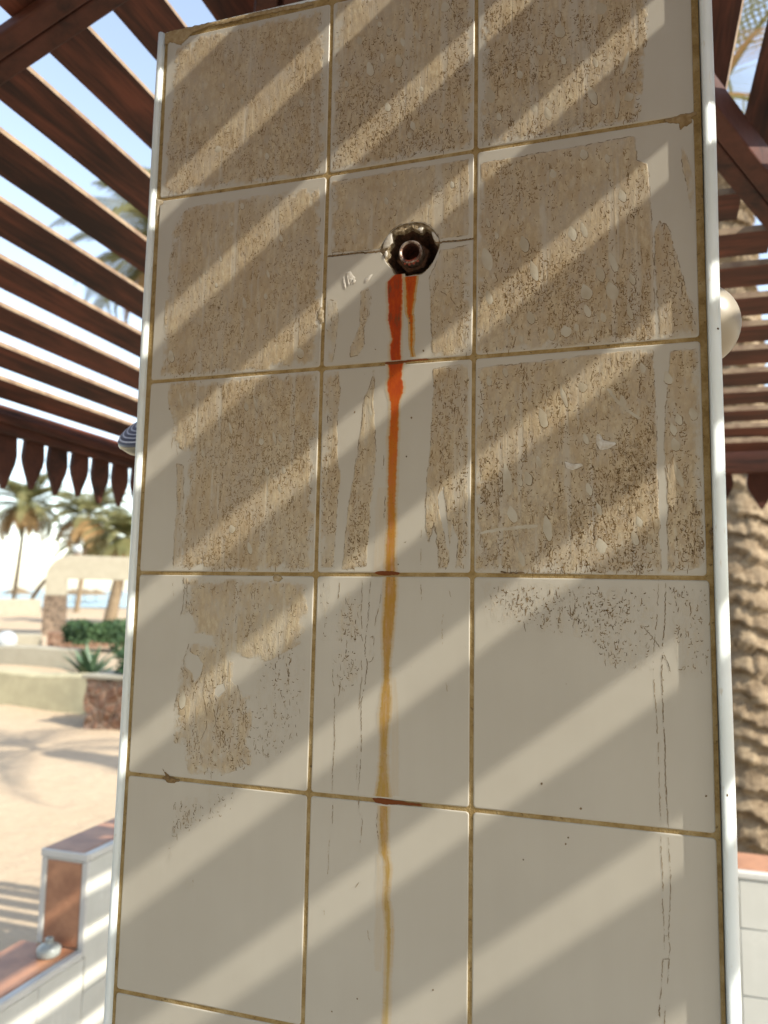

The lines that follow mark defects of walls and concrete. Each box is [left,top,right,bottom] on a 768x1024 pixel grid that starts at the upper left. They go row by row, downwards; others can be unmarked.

corrosion [372,274,428,1024]
crack [162,0,710,849]